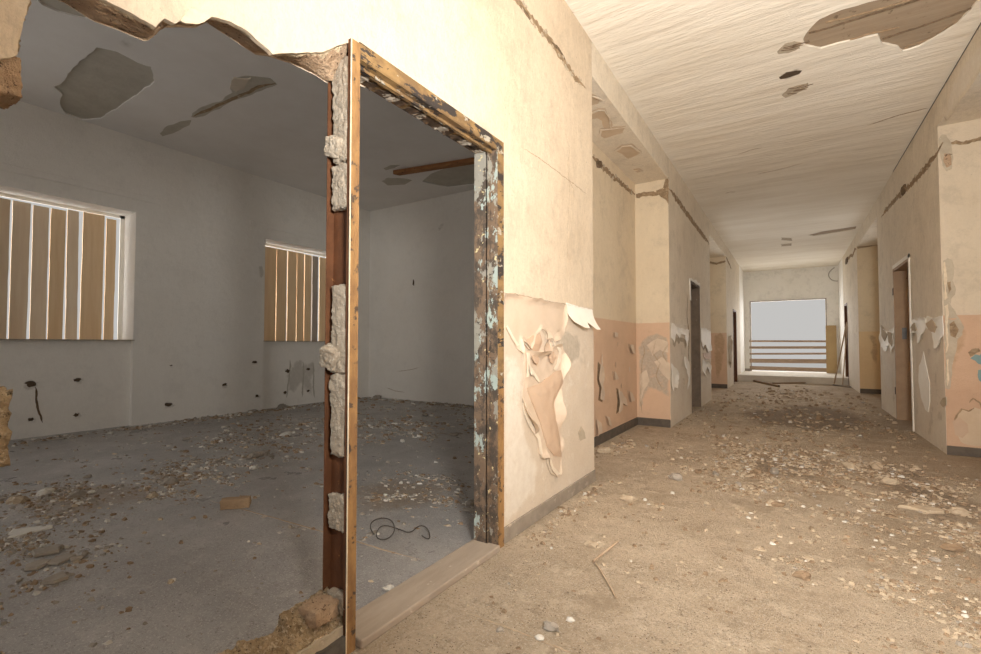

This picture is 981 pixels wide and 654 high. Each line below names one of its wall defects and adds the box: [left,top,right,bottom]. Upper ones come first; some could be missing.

spalling [0,39,23,110]
flaking render [55,47,154,119]
spalling [24,0,347,81]
spalling [160,76,277,136]
crack [514,0,585,88]
flaking render [777,0,977,54]
crack [523,133,731,268]
crack [881,137,981,217]
peeling [504,293,601,477]
peeling [701,328,712,376]
spalling [910,258,980,412]
spalling [218,587,345,654]